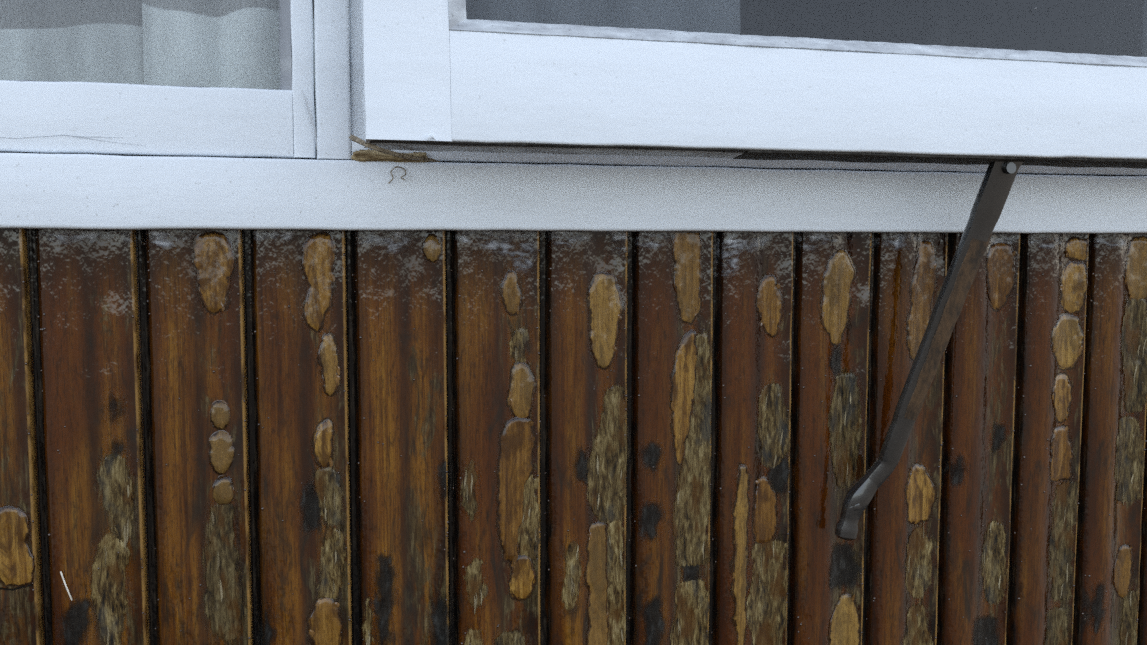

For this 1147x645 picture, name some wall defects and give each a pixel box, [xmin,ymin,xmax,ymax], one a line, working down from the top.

peeling [192,231,237,315]
peeling [302,231,341,397]
peeling [587,271,625,370]
peeling [669,233,704,465]
peeling [820,248,858,347]
peeling [1049,236,1089,482]
peeling [496,361,537,601]
leakage [62,599,90,645]
peeling [306,597,344,645]
leakage [374,555,394,645]
peeling [729,463,779,645]
peeling [827,592,861,645]